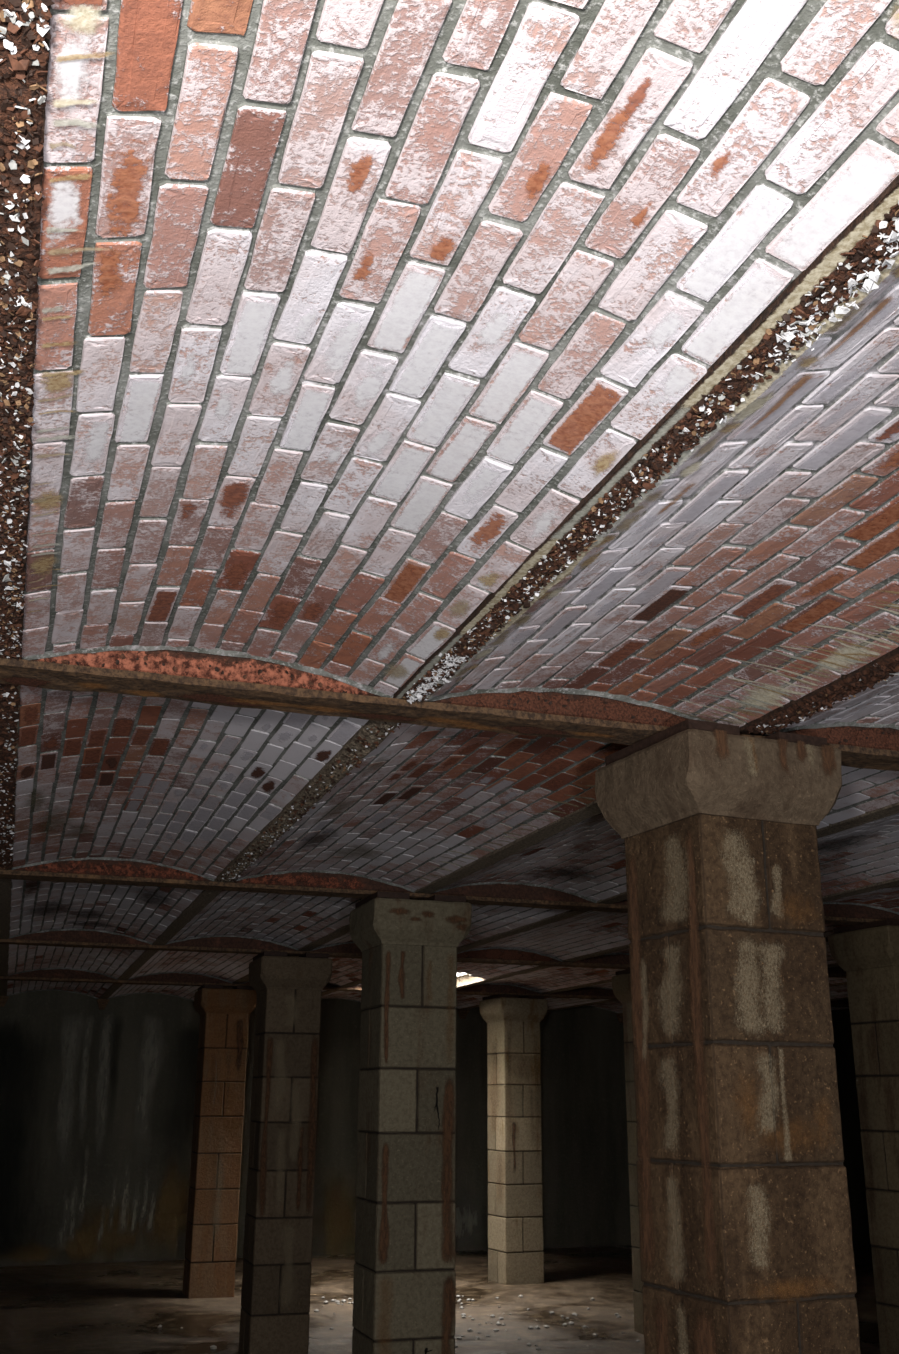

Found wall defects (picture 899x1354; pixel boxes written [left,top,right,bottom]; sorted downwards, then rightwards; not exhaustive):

water stain [59,1018,112,1143]
corrosion [441,1081,456,1354]